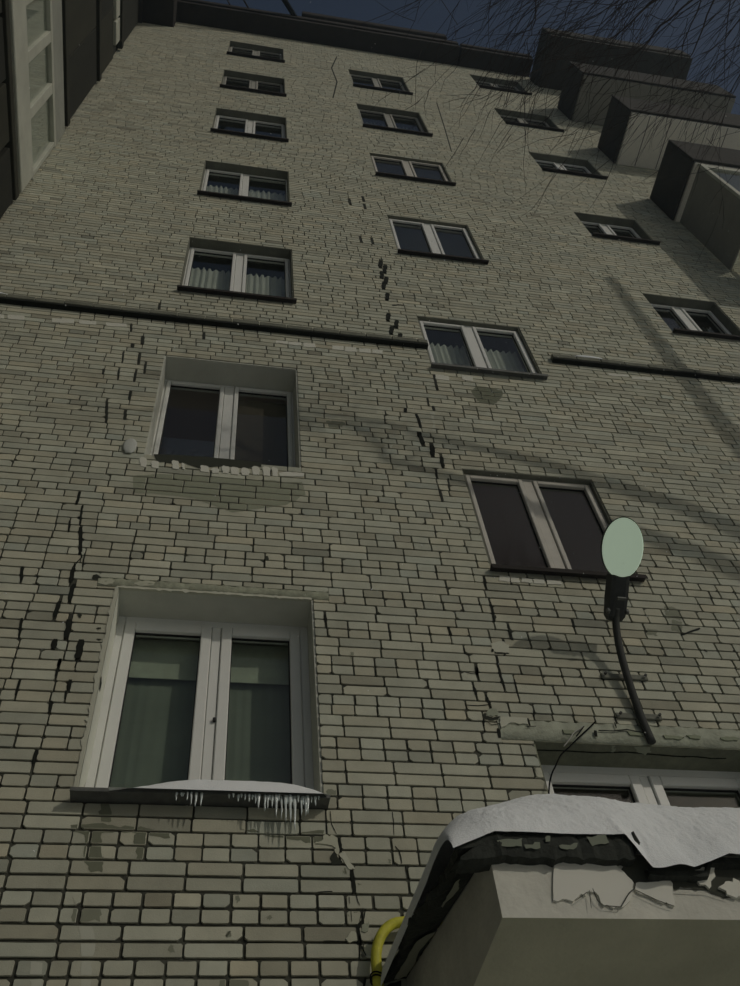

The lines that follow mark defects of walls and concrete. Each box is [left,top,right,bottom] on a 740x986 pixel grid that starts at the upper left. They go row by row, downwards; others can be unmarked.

crack [377,260,402,337]
crack [404,408,445,467]
crack [48,491,86,711]
flaking render [497,834,609,850]
flaking render [552,855,740,909]
crack [575,882,729,908]